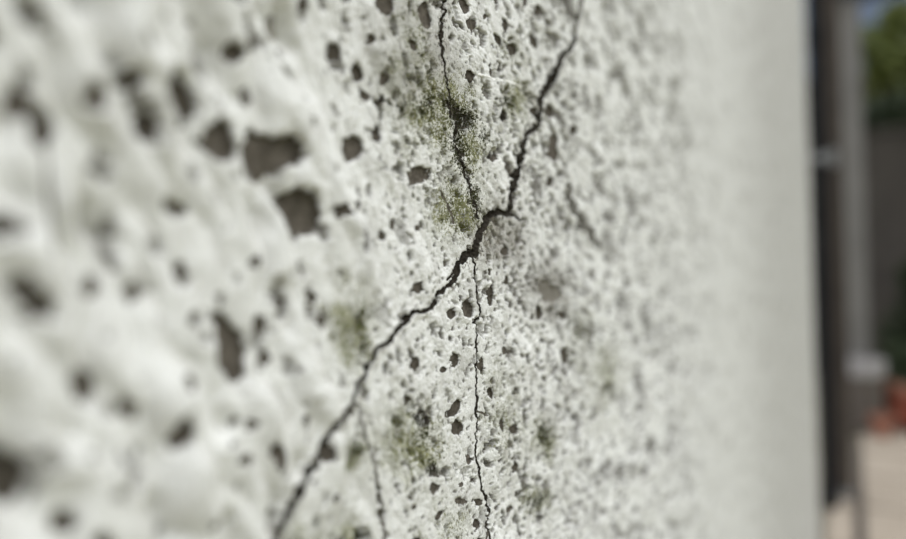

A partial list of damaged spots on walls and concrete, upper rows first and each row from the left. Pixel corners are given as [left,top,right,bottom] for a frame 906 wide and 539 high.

crack [270,0,584,539]
crack [564,183,602,247]